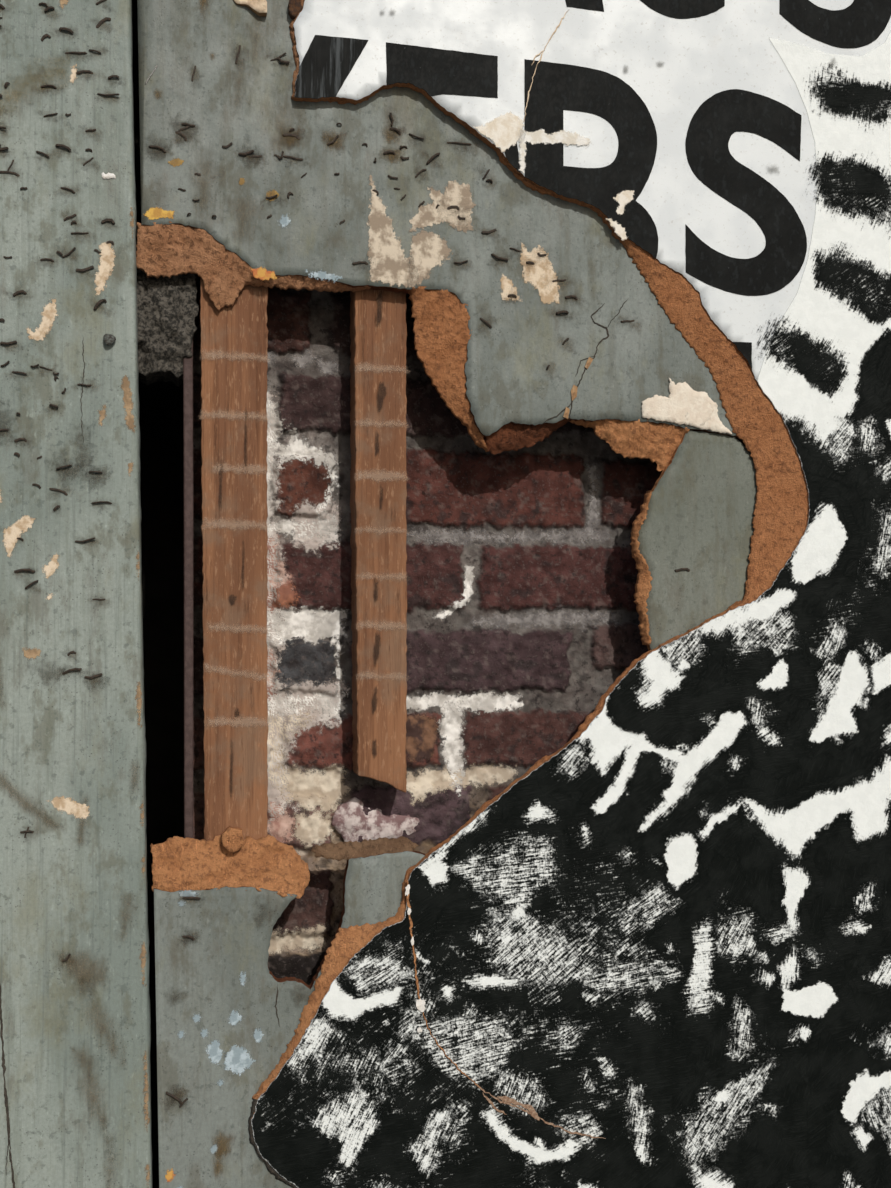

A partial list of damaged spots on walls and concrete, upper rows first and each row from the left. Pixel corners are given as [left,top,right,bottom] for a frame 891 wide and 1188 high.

peeling [366,175,476,288]
peeling [94,242,116,295]
peeling [305,270,343,282]
peeling [500,242,560,304]
peeling [27,299,58,341]
crack [544,301,626,423]
peeling [641,378,732,434]
leakage [389,465,609,546]
leakage [206,390,351,851]
leakage [467,605,622,631]
spalling [406,712,440,762]
leakage [406,690,524,805]